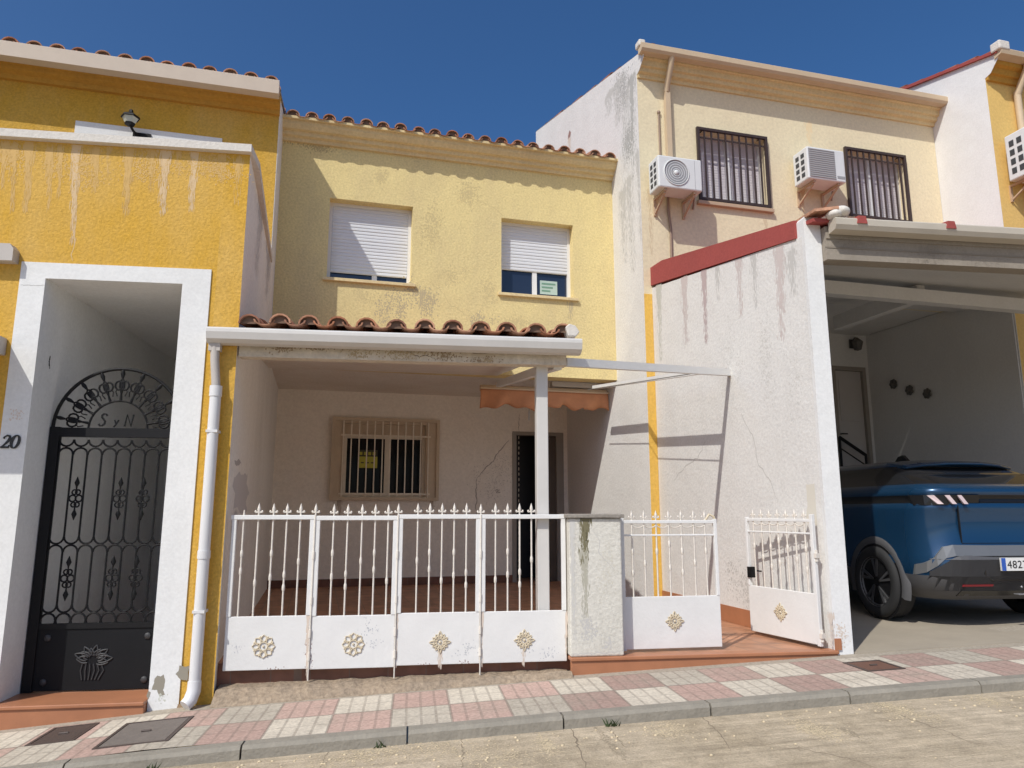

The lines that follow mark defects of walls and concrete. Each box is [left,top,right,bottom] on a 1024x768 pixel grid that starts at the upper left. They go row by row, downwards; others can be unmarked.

damp [0,140,251,244]
damp [604,64,671,269]
damp [701,244,803,434]
crack [475,415,520,514]
damp [569,519,622,649]
spalling [147,666,189,699]